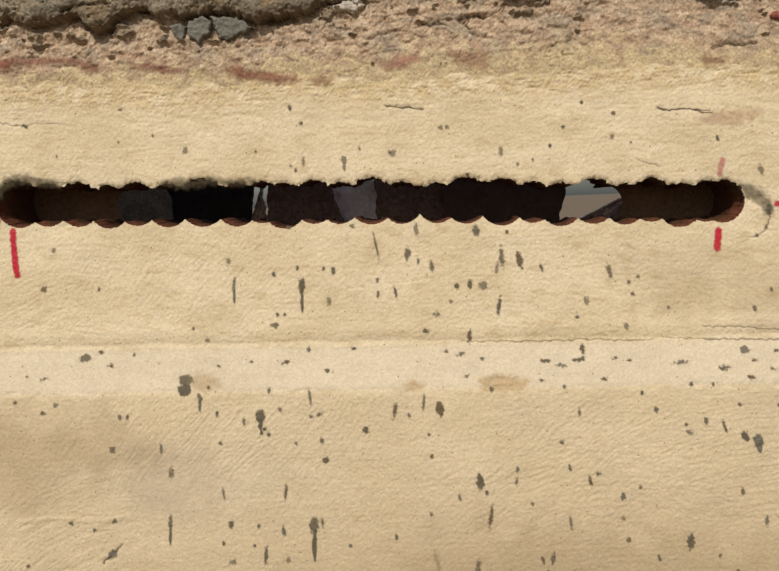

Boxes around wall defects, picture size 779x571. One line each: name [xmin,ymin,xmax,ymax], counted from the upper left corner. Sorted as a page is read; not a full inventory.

spalling [0,0,779,89]